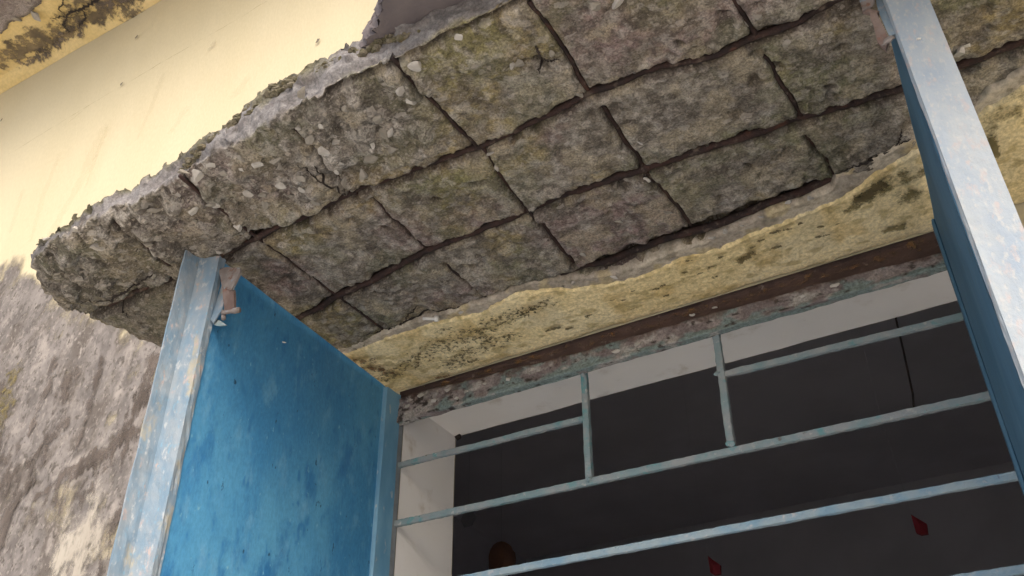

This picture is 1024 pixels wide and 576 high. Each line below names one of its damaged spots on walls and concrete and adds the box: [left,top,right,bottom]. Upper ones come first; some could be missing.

leakage [0,0,144,70]
spalling [930,0,1024,115]
spalling [31,0,918,353]
leakage [736,222,803,264]
leakage [815,168,925,238]
leakage [381,297,560,382]